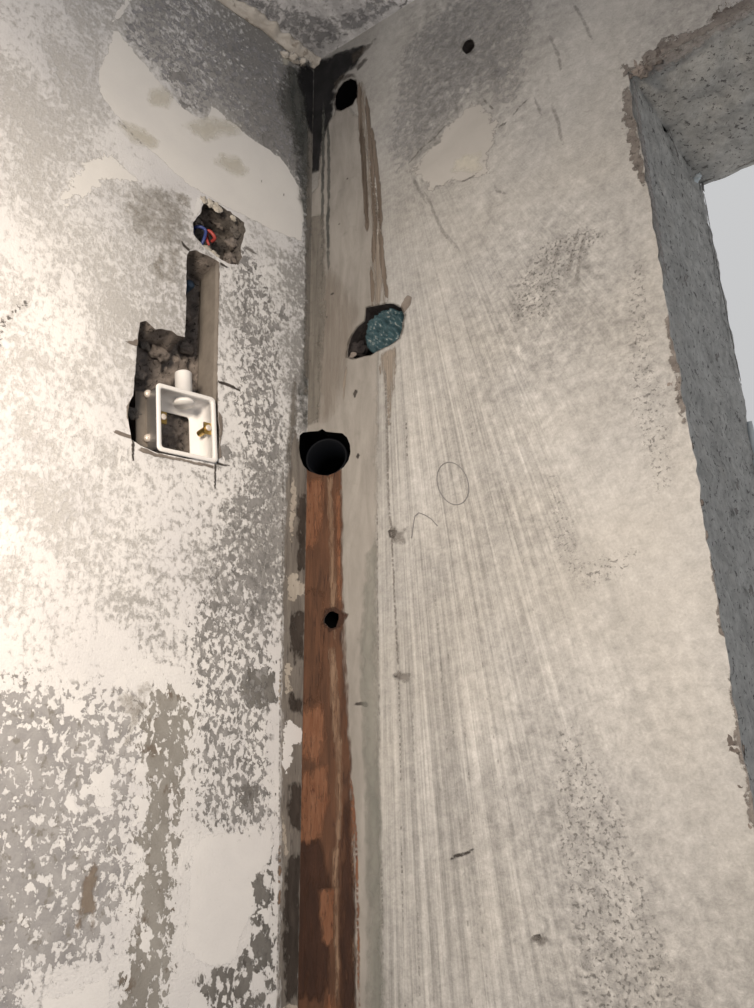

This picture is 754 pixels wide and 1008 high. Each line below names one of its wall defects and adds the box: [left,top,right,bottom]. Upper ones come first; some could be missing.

peeling [125,0,307,183]
peeling [0,196,305,1008]
corrosion [298,469,360,1008]